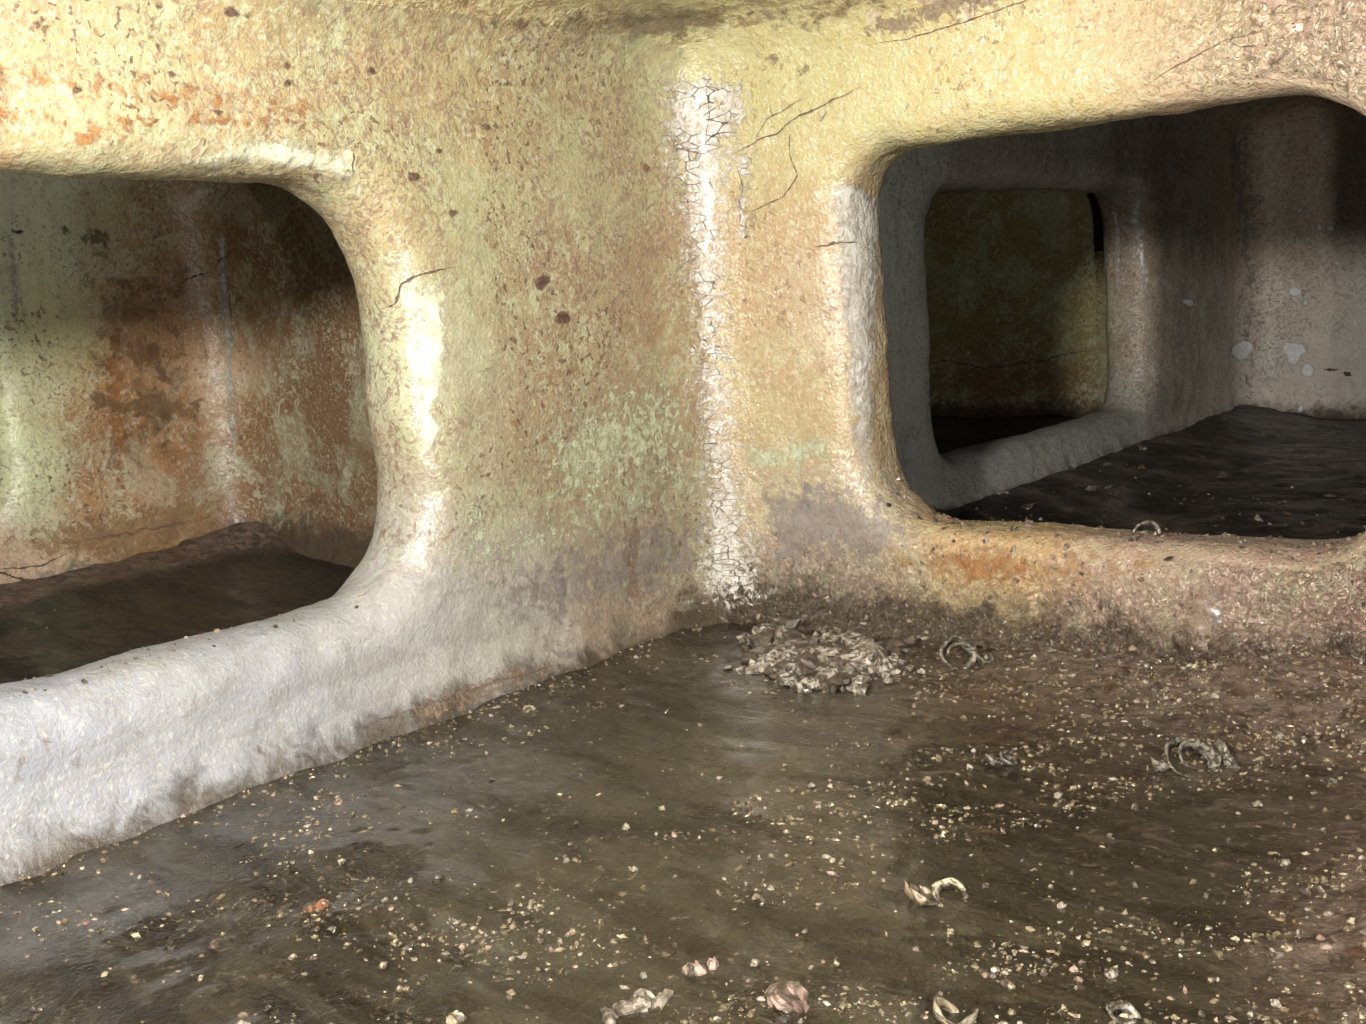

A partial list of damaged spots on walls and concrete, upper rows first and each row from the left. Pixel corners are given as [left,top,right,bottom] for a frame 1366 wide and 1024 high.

crack [666,80,860,212]
rust [92,270,197,471]
crack [0,519,200,581]
rust [899,544,1152,593]